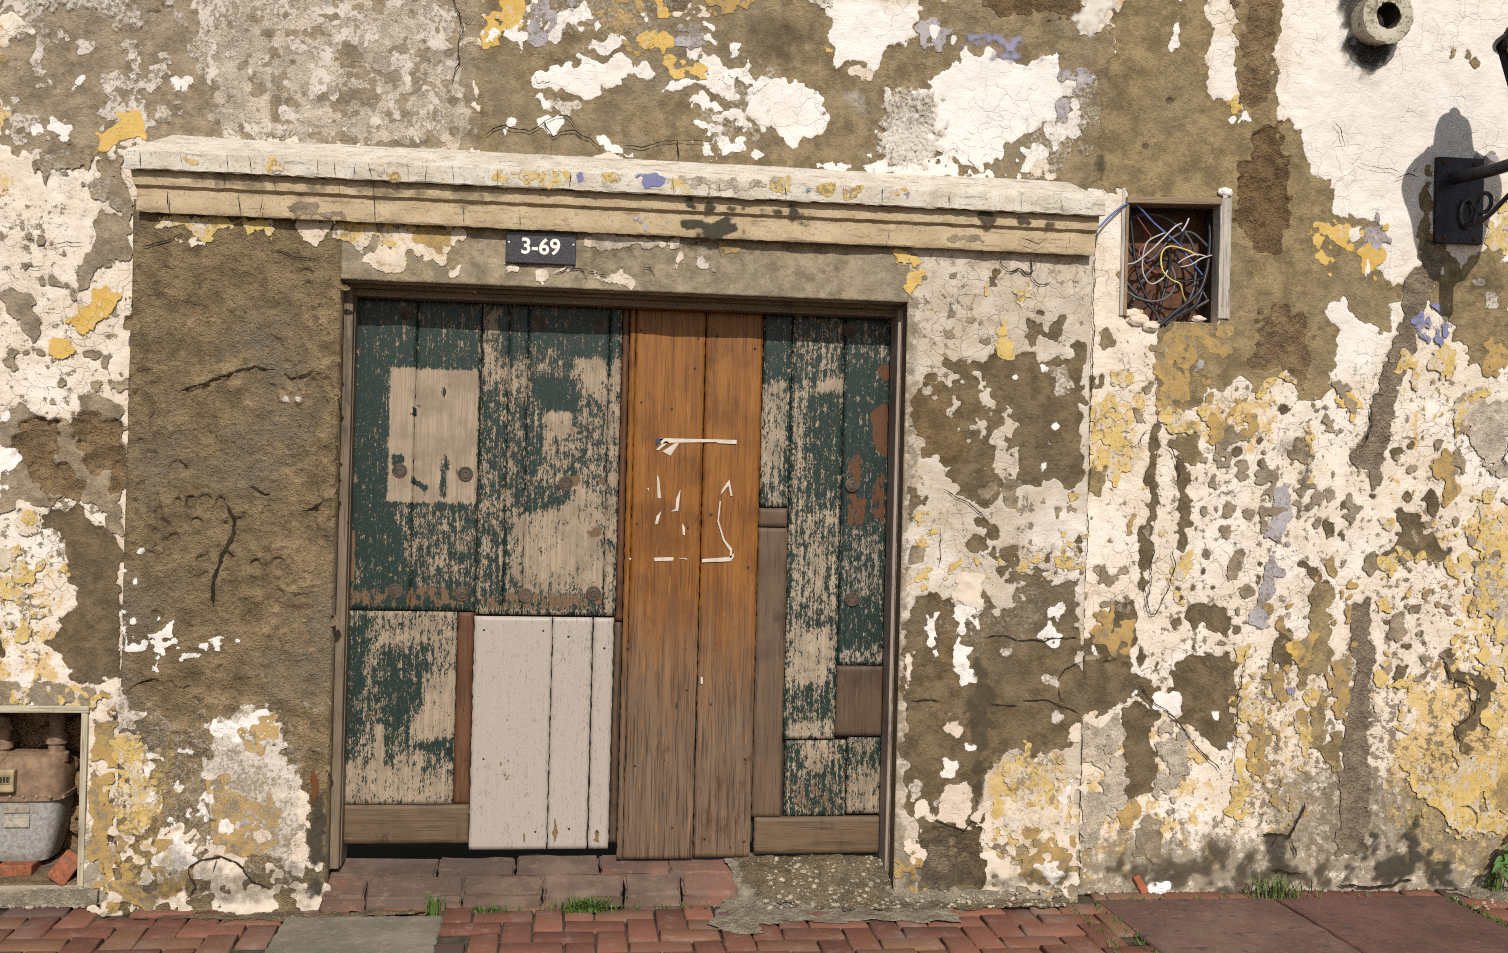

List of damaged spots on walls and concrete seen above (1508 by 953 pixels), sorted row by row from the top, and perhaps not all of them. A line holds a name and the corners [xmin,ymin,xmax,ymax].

peeling [0,0,1508,657]
peeling [0,285,330,917]
peeling [894,517,1430,900]
water stain [1106,814,1459,895]
peeling [1363,386,1508,840]